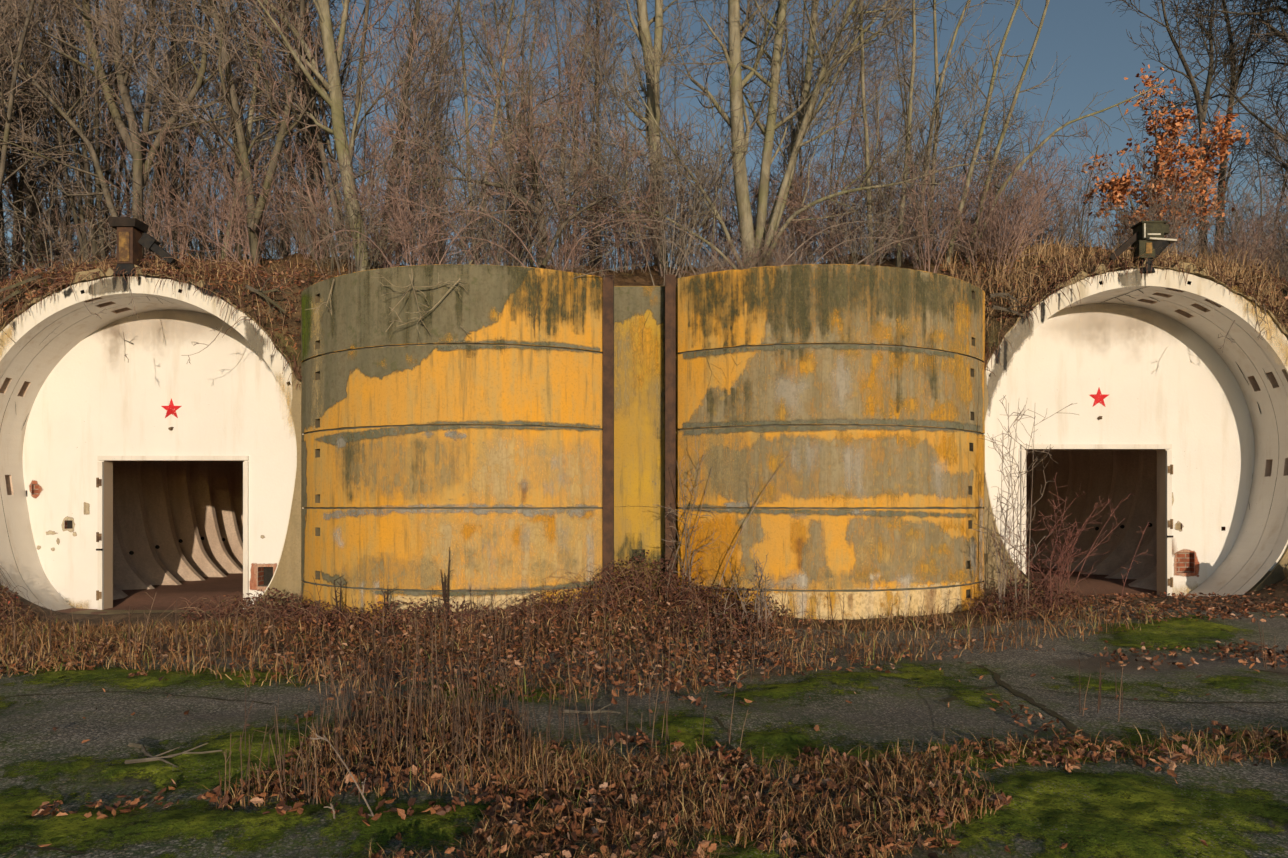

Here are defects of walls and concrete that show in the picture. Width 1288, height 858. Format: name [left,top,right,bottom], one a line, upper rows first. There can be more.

peeling [283,264,533,598]
peeling [678,264,1033,585]
crack [939,665,1288,743]